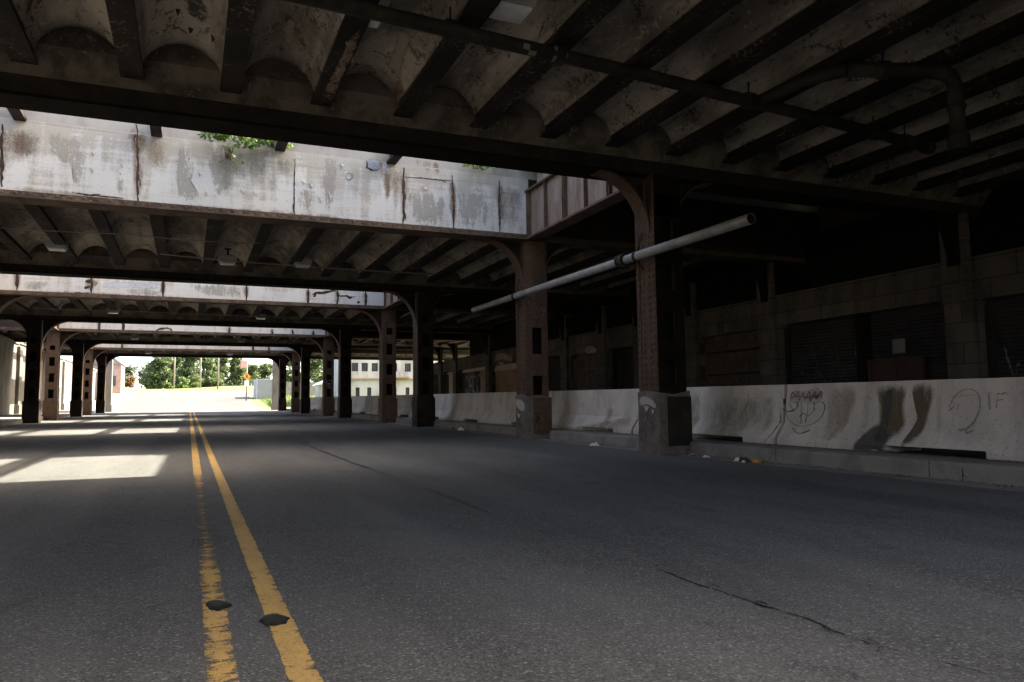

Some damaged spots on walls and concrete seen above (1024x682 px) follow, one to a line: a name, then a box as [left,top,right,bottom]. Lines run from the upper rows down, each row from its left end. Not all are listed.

crack [661,570,890,654]